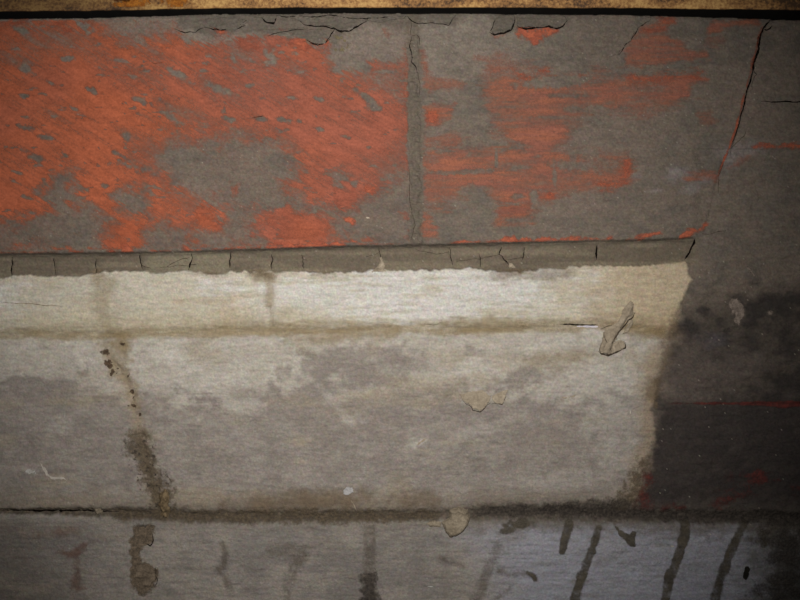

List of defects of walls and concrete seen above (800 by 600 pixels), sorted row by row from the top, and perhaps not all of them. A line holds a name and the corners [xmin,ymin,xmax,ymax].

peeling [0,14,408,252]
peeling [490,14,567,45]
peeling [423,67,708,225]
peeling [590,15,707,64]
crack [718,19,800,192]
crack [139,254,196,270]
peeling [598,301,634,356]
leakage [474,460,800,600]